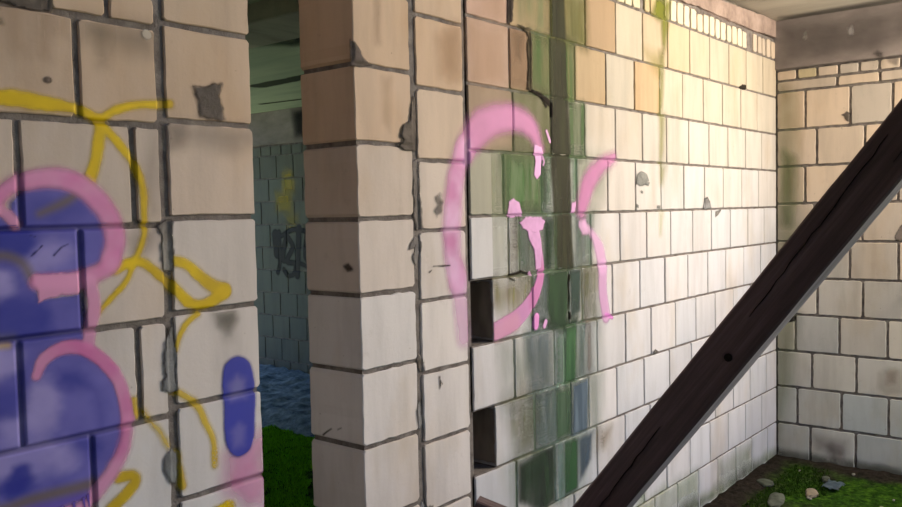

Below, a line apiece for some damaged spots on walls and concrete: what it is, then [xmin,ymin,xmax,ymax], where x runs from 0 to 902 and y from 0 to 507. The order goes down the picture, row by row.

damp [495,0,596,507]
damp [653,0,670,48]